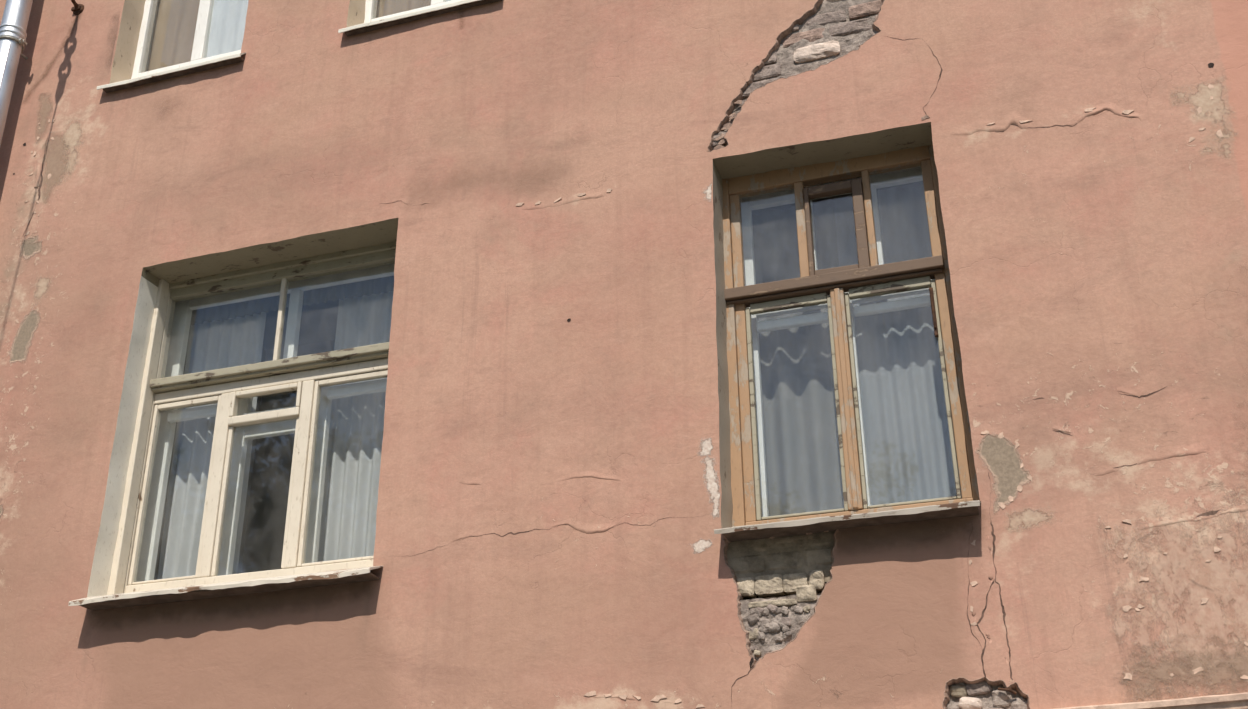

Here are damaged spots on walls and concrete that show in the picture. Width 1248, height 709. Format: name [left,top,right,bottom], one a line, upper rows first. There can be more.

flaking render [707,0,884,152]
crack [890,37,942,120]
peeling [1178,84,1230,157]
flaking render [9,278,49,363]
peeling [698,438,720,517]
flaking render [975,430,1047,530]
crack [1092,443,1205,476]
crack [389,514,708,557]
flaking render [693,530,837,669]
crack [967,474,1013,680]
flaking render [942,676,1031,709]
flaking render [1123,642,1248,695]